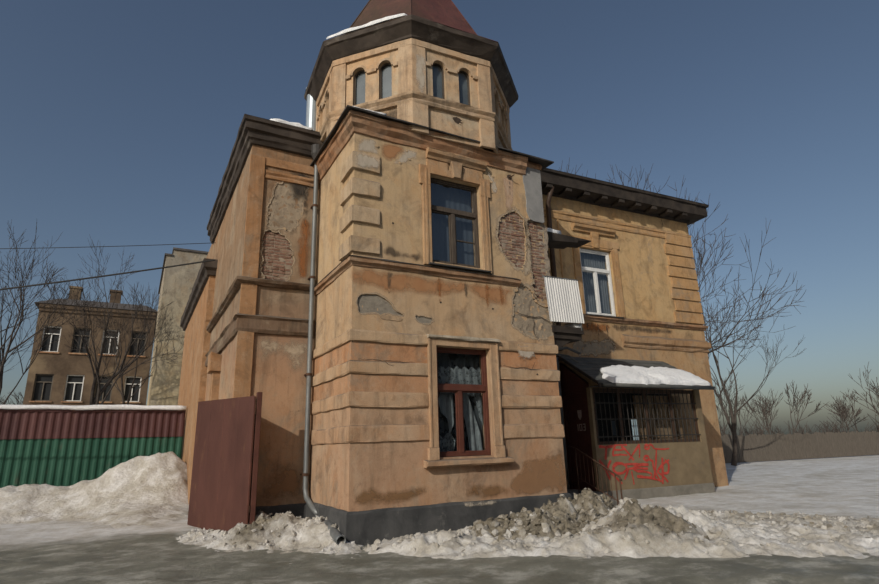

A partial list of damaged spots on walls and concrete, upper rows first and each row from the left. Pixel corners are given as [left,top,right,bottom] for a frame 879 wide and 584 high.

flaking render [260,181,309,281]
spalling [357,293,404,321]
peeling [495,207,556,359]
leakage [357,489,423,503]
leakage [465,454,566,506]